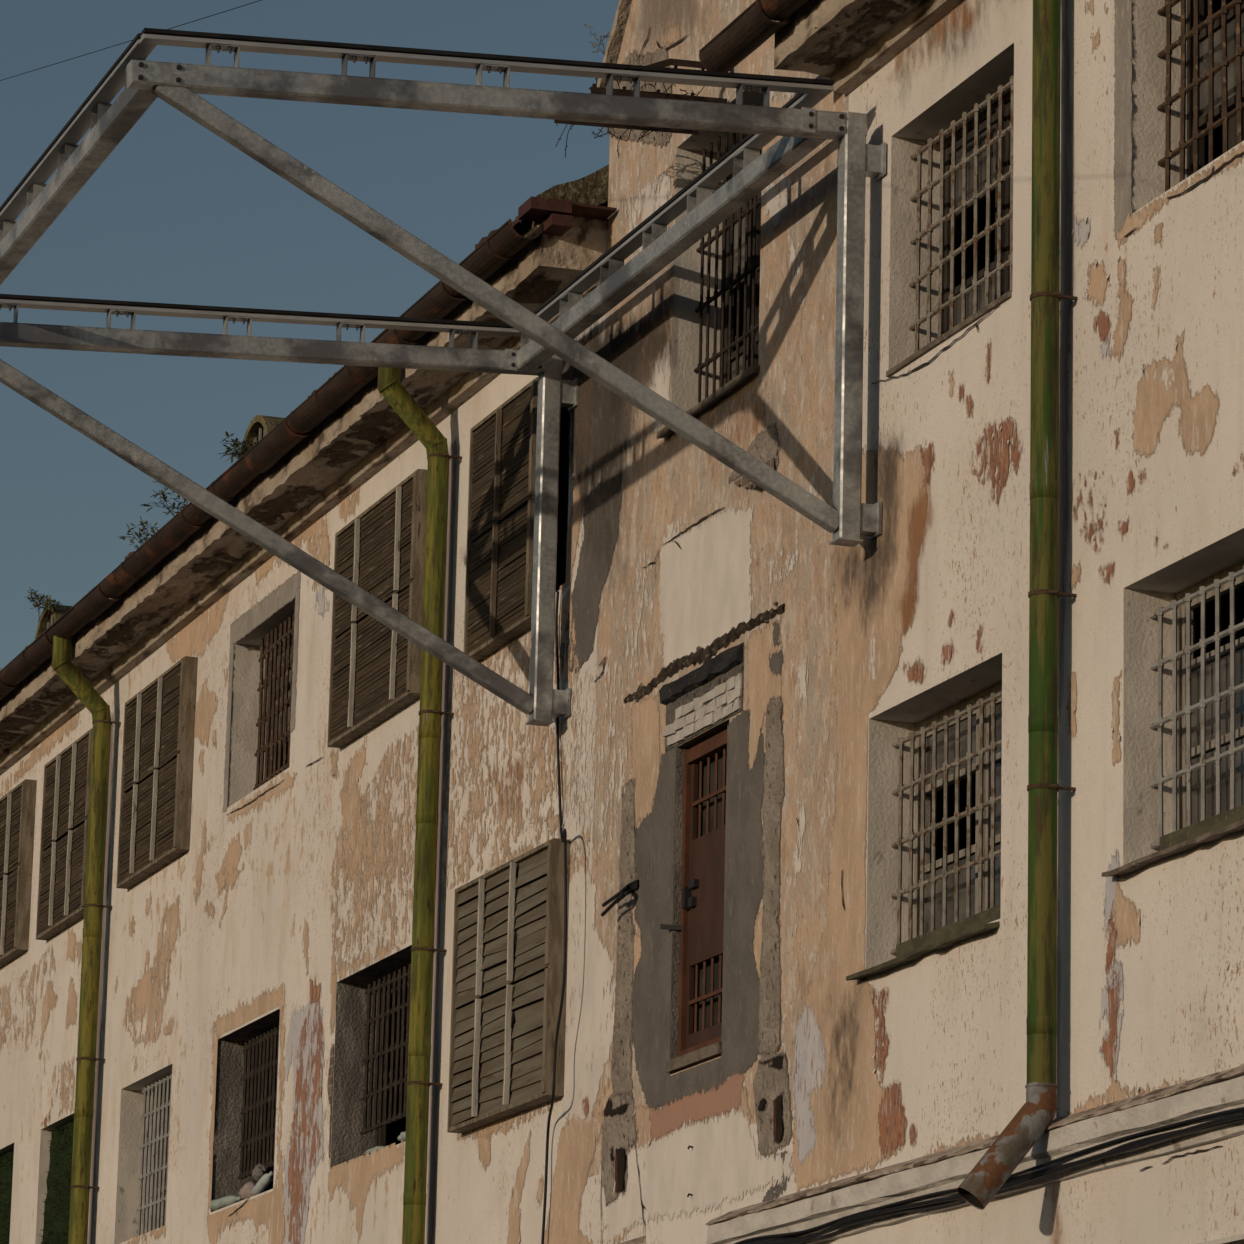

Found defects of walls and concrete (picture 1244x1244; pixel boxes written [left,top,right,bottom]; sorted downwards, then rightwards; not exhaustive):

water stain [564,361,639,560]
water stain [582,268,674,385]
peeling [622,171,672,233]
water stain [845,445,897,607]
peeling [970,416,1022,503]
peeling [1070,471,1129,584]
peeling [1085,143,1244,362]
peeling [1114,330,1219,495]
peeling [440,364,998,1244]
peeling [114,771,297,1071]
peeling [206,725,419,1244]
peeling [1067,850,1187,1115]